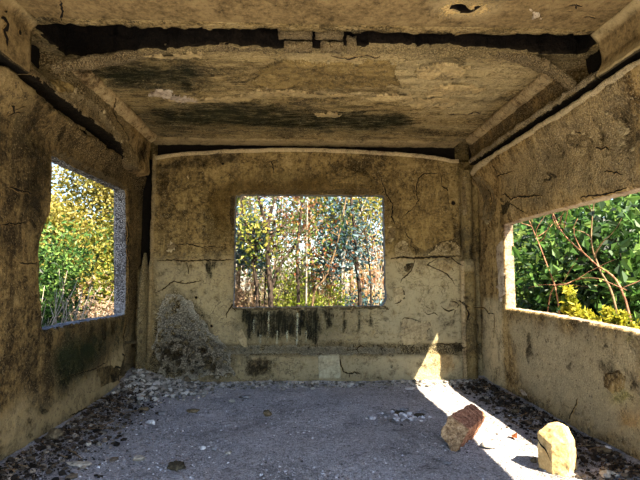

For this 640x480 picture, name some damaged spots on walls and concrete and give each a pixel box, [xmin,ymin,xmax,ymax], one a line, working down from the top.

crack [1,10,10,46]
damp [91,61,198,91]
spalling [50,42,270,143]
damp [150,102,418,131]
flaking render [148,28,486,109]
crack [157,243,232,292]
crack [376,172,495,356]
damp [242,309,334,350]
spalling [151,294,431,380]
crack [339,345,365,377]